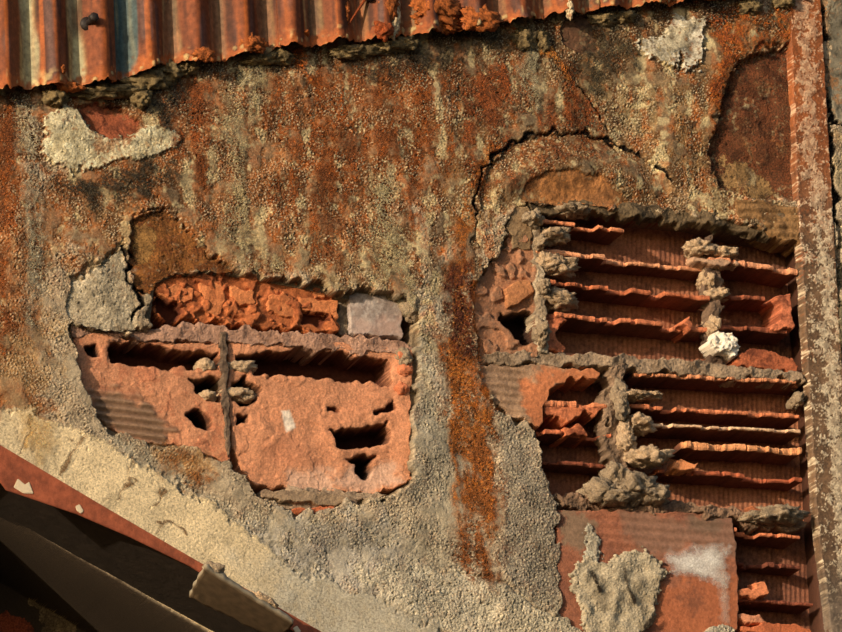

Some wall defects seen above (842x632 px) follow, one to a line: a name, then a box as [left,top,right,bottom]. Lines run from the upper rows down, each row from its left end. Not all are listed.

corrosion [190,46,216,63]
corrosion [373,0,500,42]
corrosion [565,0,574,21]
corrosion [707,0,795,131]
corrosion [0,98,34,232]
corrosion [172,75,219,202]
corrosion [264,48,441,264]
crack [471,87,673,223]
spalling [66,210,420,515]
corrosion [438,44,615,583]
spalling [471,43,813,632]
efflorescence [669,549,724,583]